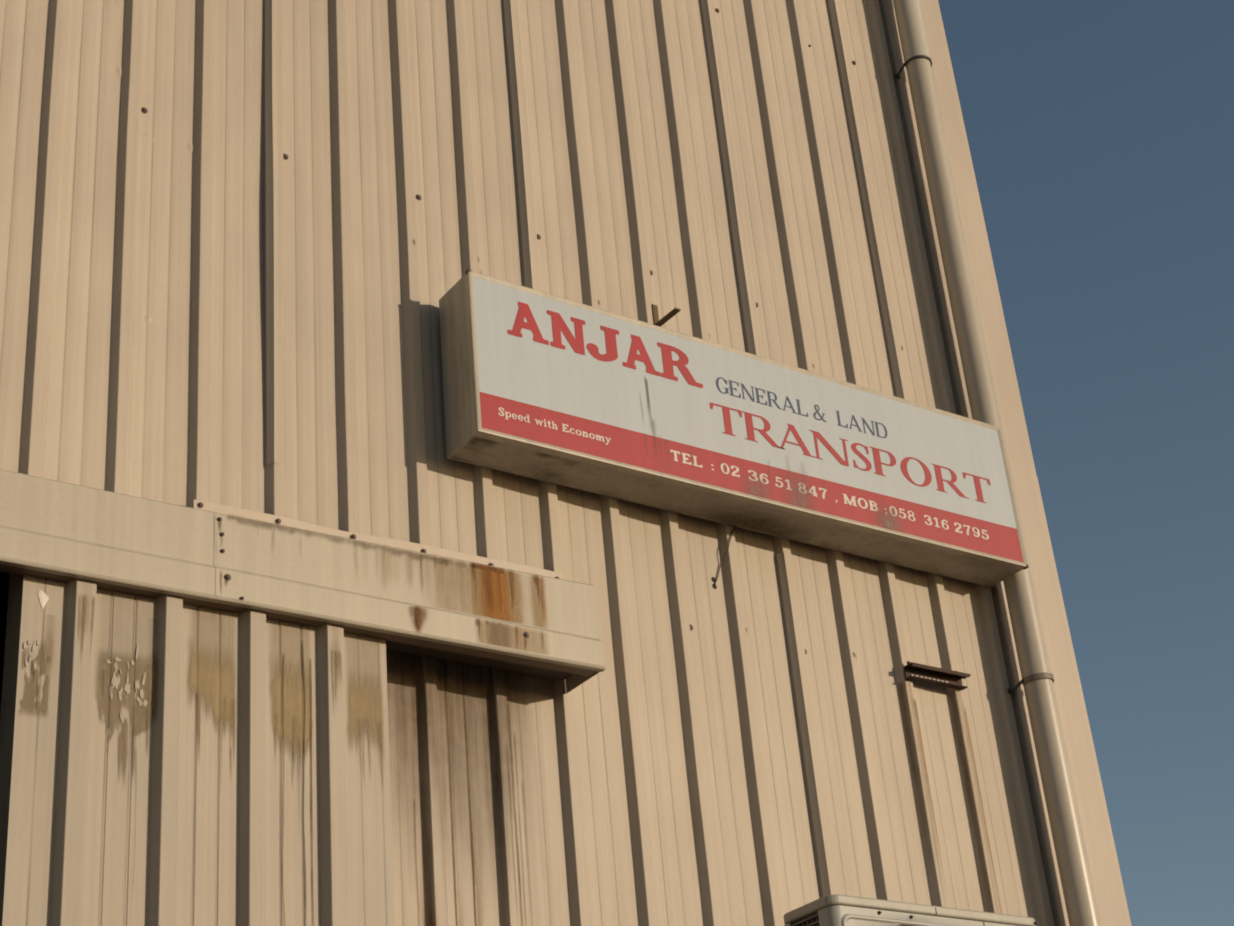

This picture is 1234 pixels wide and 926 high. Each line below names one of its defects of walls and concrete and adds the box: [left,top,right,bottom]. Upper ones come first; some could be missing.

corrosion [472,563,526,650]
corrosion [534,576,544,627]
peeling [21,639,52,713]
peeling [98,644,157,773]
water stain [189,651,234,727]
water stain [271,643,314,926]
water stain [349,649,516,926]